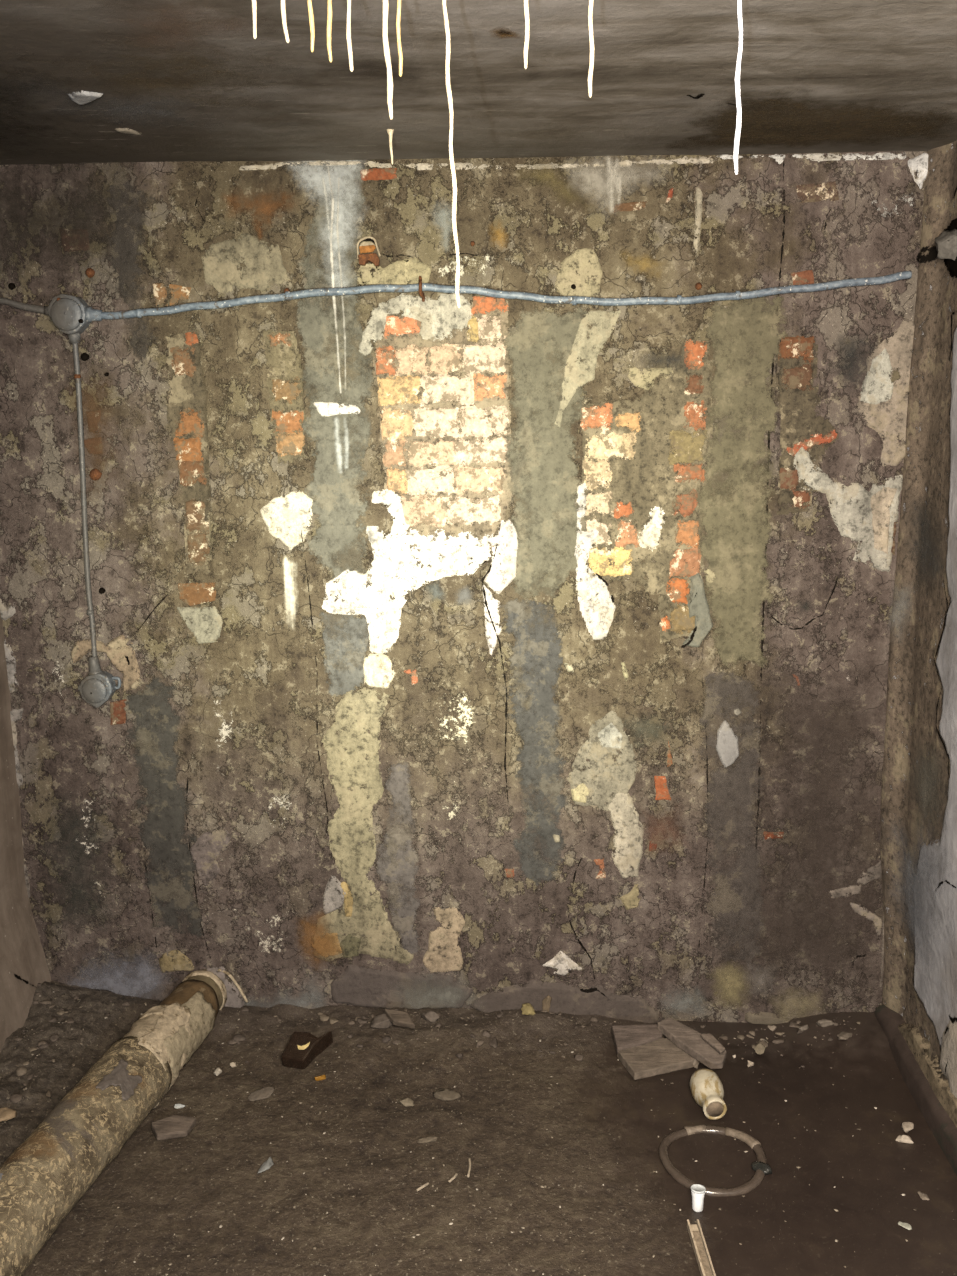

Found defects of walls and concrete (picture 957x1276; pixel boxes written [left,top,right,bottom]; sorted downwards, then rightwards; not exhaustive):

leakage [239,98,951,390]
flaking render [263,329,360,464]
leakage [335,419,348,469]
flaking render [555,248,716,647]
peeling [260,490,313,550]
flaking render [314,257,518,973]
flaking render [775,140,957,1127]
peeling [567,710,657,910]
flaking render [654,741,673,800]
peeling [716,709,742,768]
peeling [471,951,661,1023]
crack [940,1016,957,1073]